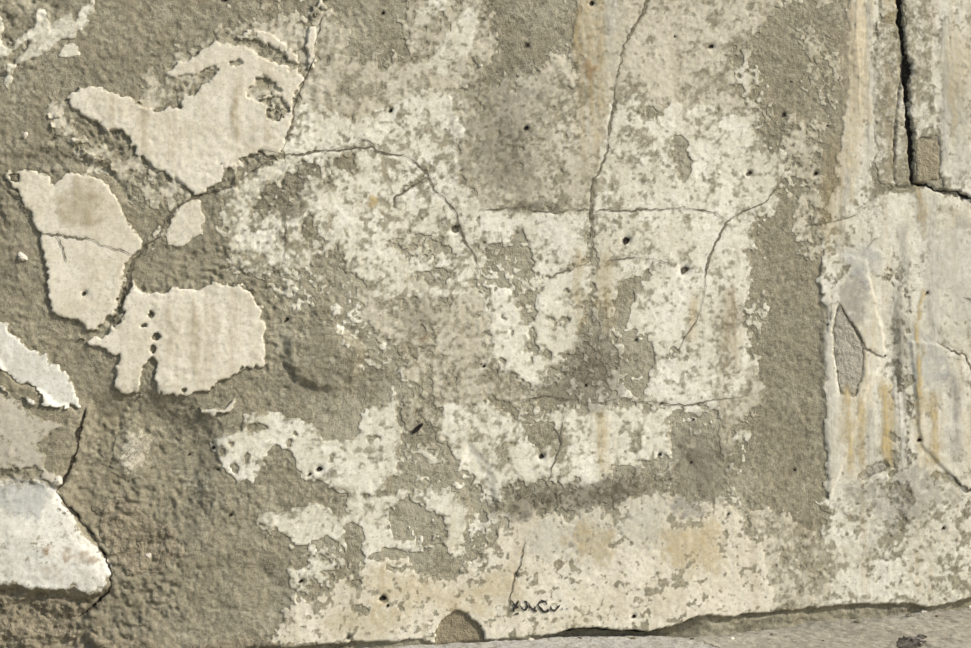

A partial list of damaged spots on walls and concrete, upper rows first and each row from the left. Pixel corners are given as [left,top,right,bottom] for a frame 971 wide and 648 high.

peeling [0,322,81,410]
crack [56,409,113,618]
peeling [0,385,187,648]
peeling [81,280,268,397]
peeling [210,395,448,512]
crack [42,0,785,350]
peeling [565,0,803,209]
peeling [726,472,971,612]
peeling [775,0,971,505]
crack [892,0,971,199]
crack [937,341,971,384]
crack [950,475,971,492]